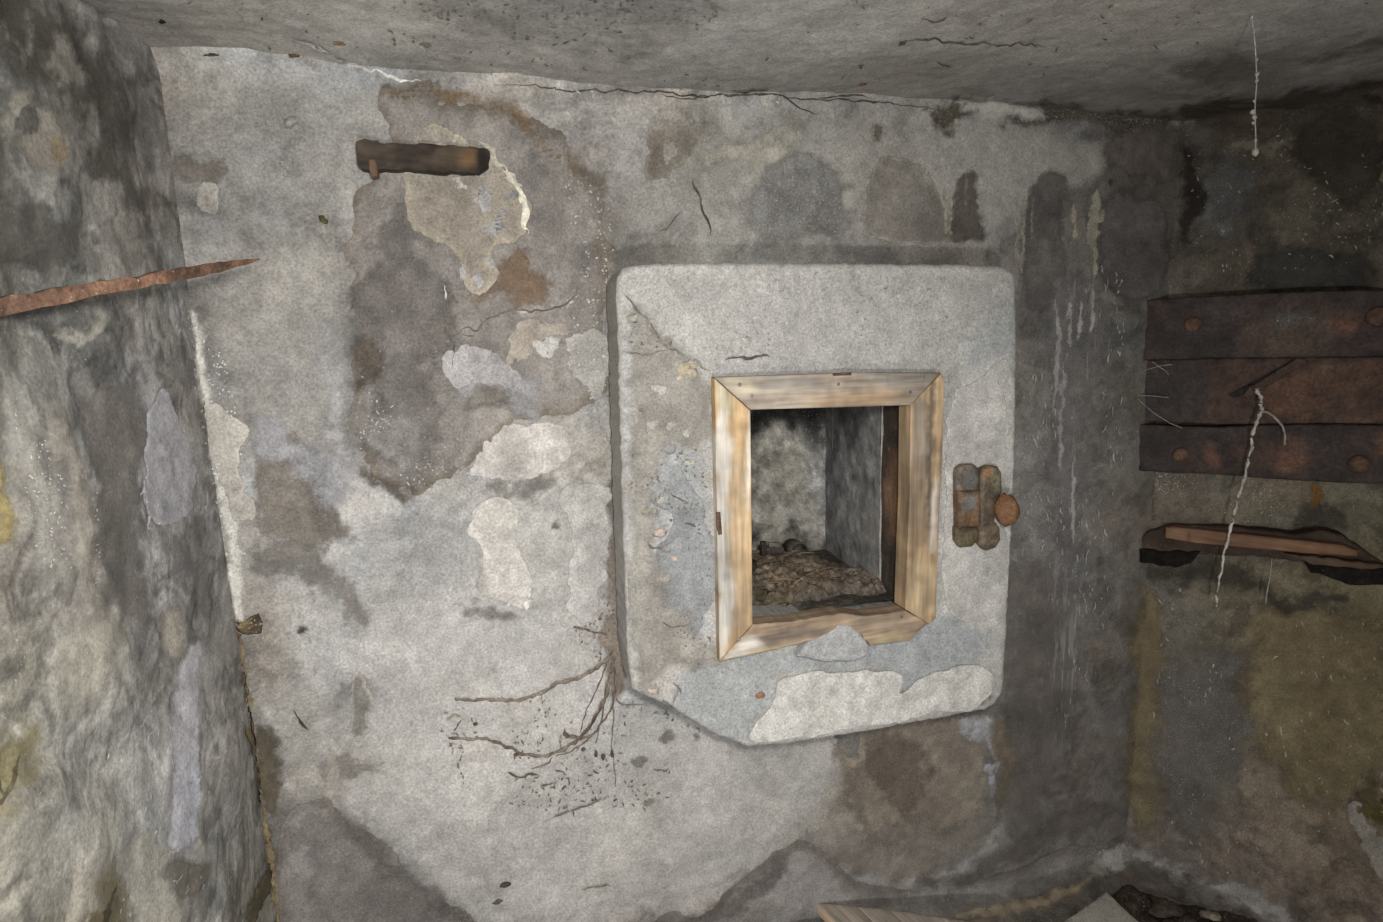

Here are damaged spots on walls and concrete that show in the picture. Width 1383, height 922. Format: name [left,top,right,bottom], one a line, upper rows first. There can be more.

crack [899,18,1045,67]
spalling [644,125,703,180]
water stain [698,114,850,245]
flaking render [345,80,617,495]
water stain [930,5,1383,552]
spalling [627,304,718,694]
peeling [749,665,993,758]